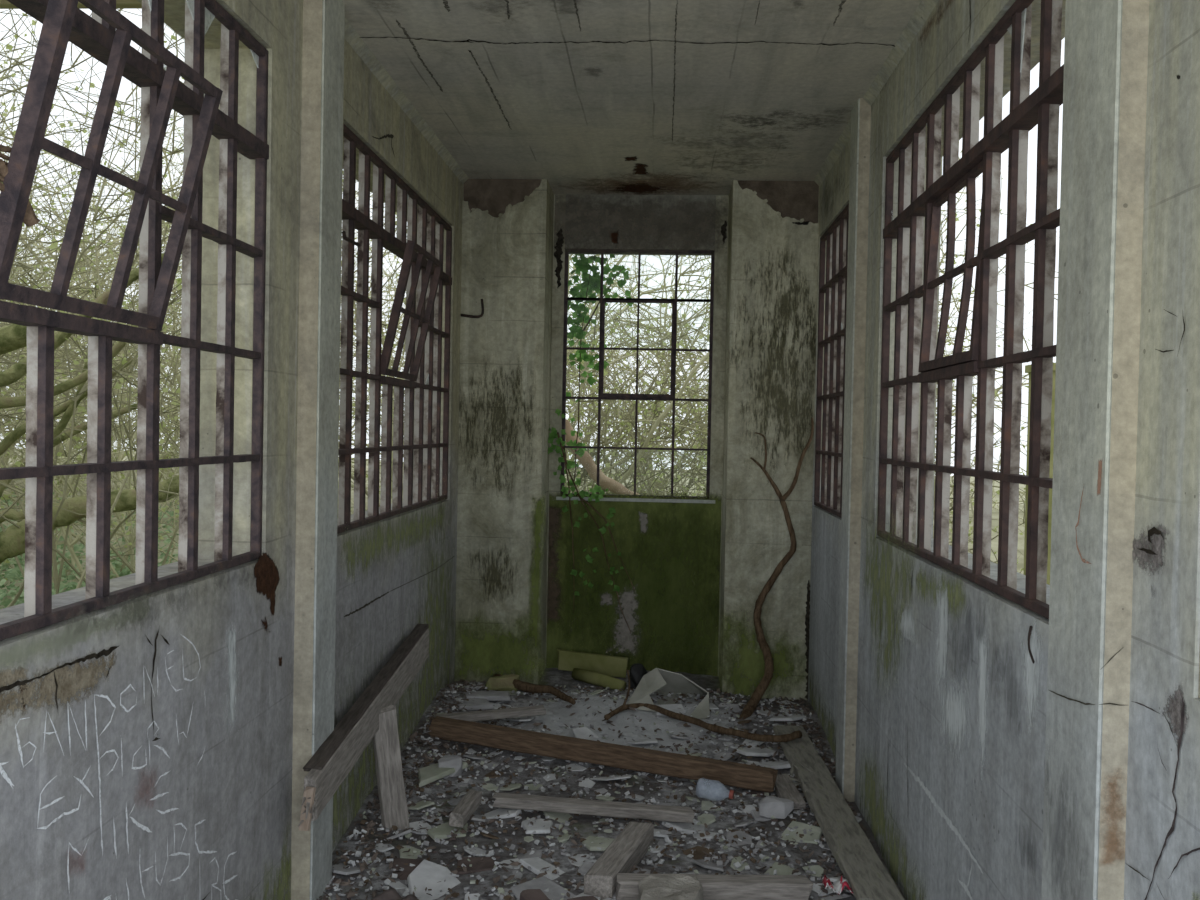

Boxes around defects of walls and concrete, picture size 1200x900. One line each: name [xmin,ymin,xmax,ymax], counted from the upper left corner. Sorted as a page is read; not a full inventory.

crack [359,0,895,142]
peeling [463,179,542,218]
peeling [737,180,819,225]
damp [458,369,532,491]
rust [254,552,280,632]
damp [475,550,513,600]
damp [547,507,562,622]
spalling [1132,526,1167,573]
spalling [0,646,119,717]
damp [936,591,997,775]
damp [1011,625,1041,726]
crack [1049,690,1200,900]